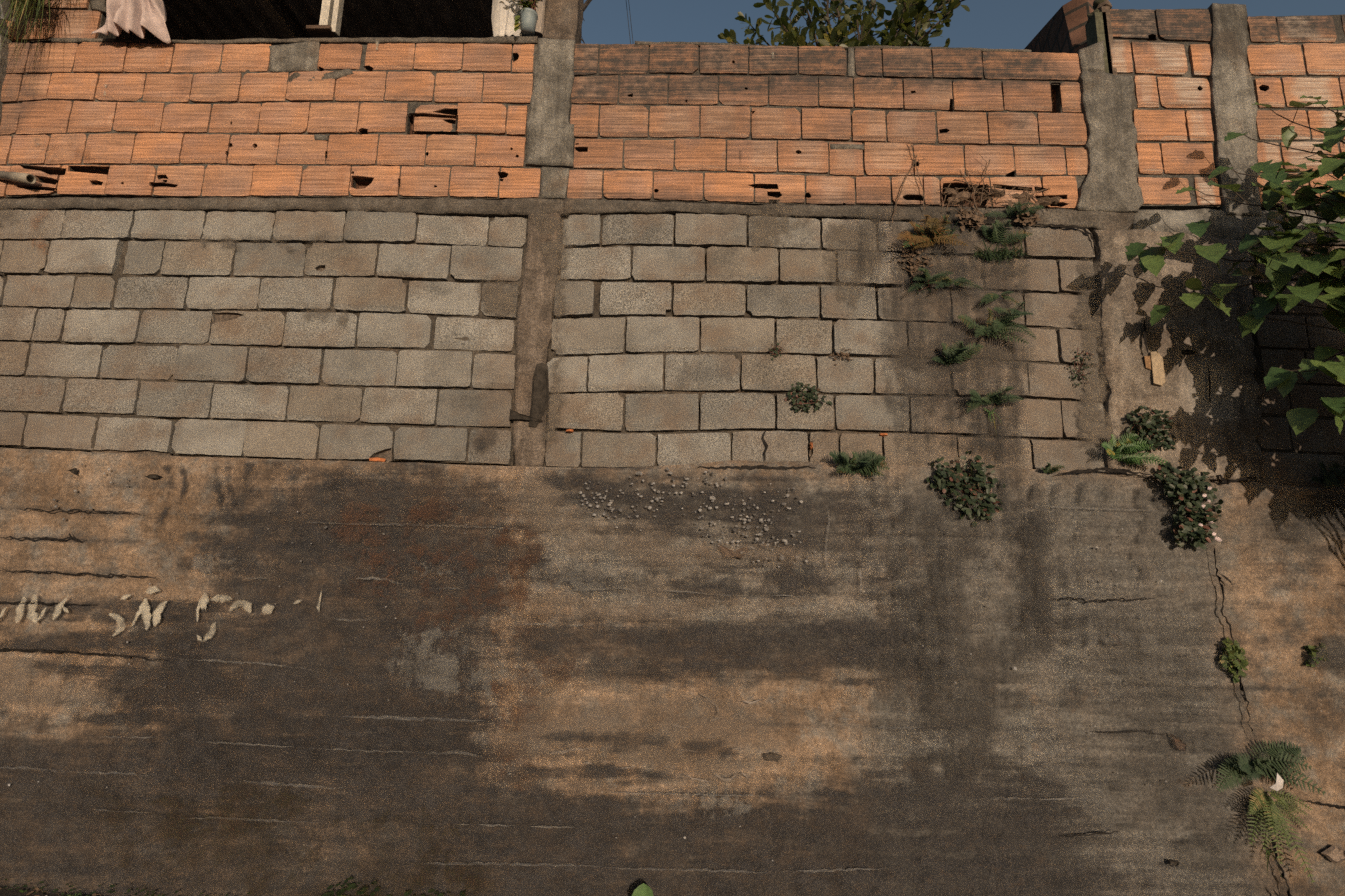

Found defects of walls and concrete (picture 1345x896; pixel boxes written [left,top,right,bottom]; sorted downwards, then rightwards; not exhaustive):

spalling [407,108,459,135]
spalling [940,188,991,208]
damp [0,208,1171,896]
crack [1213,546,1256,739]
crack [1267,801,1292,896]